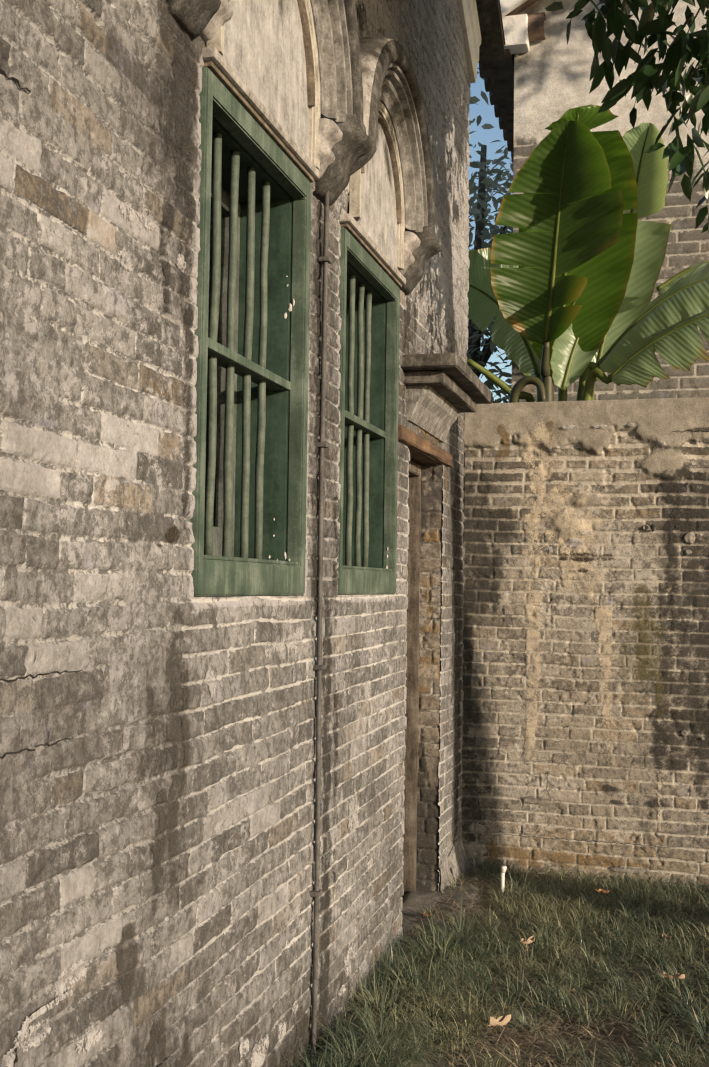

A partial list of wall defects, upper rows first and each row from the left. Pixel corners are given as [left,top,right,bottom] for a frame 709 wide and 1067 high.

crack [0,69,31,94]
leakage [158,0,233,528]
leakage [265,0,459,1067]
crack [0,650,83,683]
leakage [205,670,217,697]
leakage [451,421,615,844]
leakage [643,462,709,831]
crack [0,732,73,759]
leakage [134,606,191,915]
leakage [602,785,624,805]
leakage [116,923,140,1024]
leakage [141,1008,193,1067]